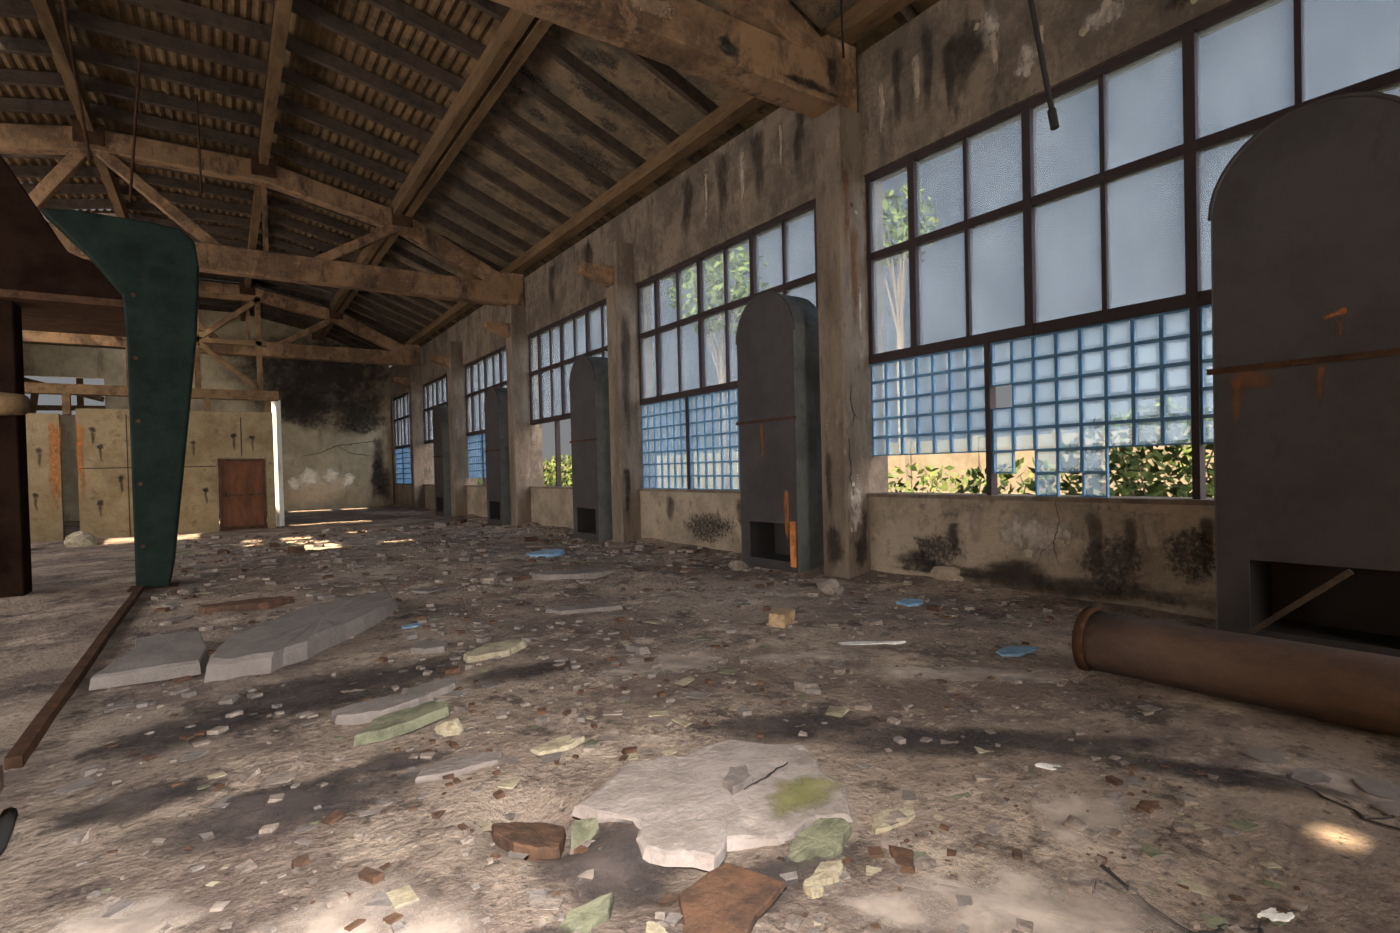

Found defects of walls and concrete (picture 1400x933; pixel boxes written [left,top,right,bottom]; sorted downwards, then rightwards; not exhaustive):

flaking render [1078,0,1124,37]
damp [878,24,984,131]
damp [683,132,763,230]
damp [779,113,803,165]
damp [901,507,1215,604]
crack [1296,783,1400,830]